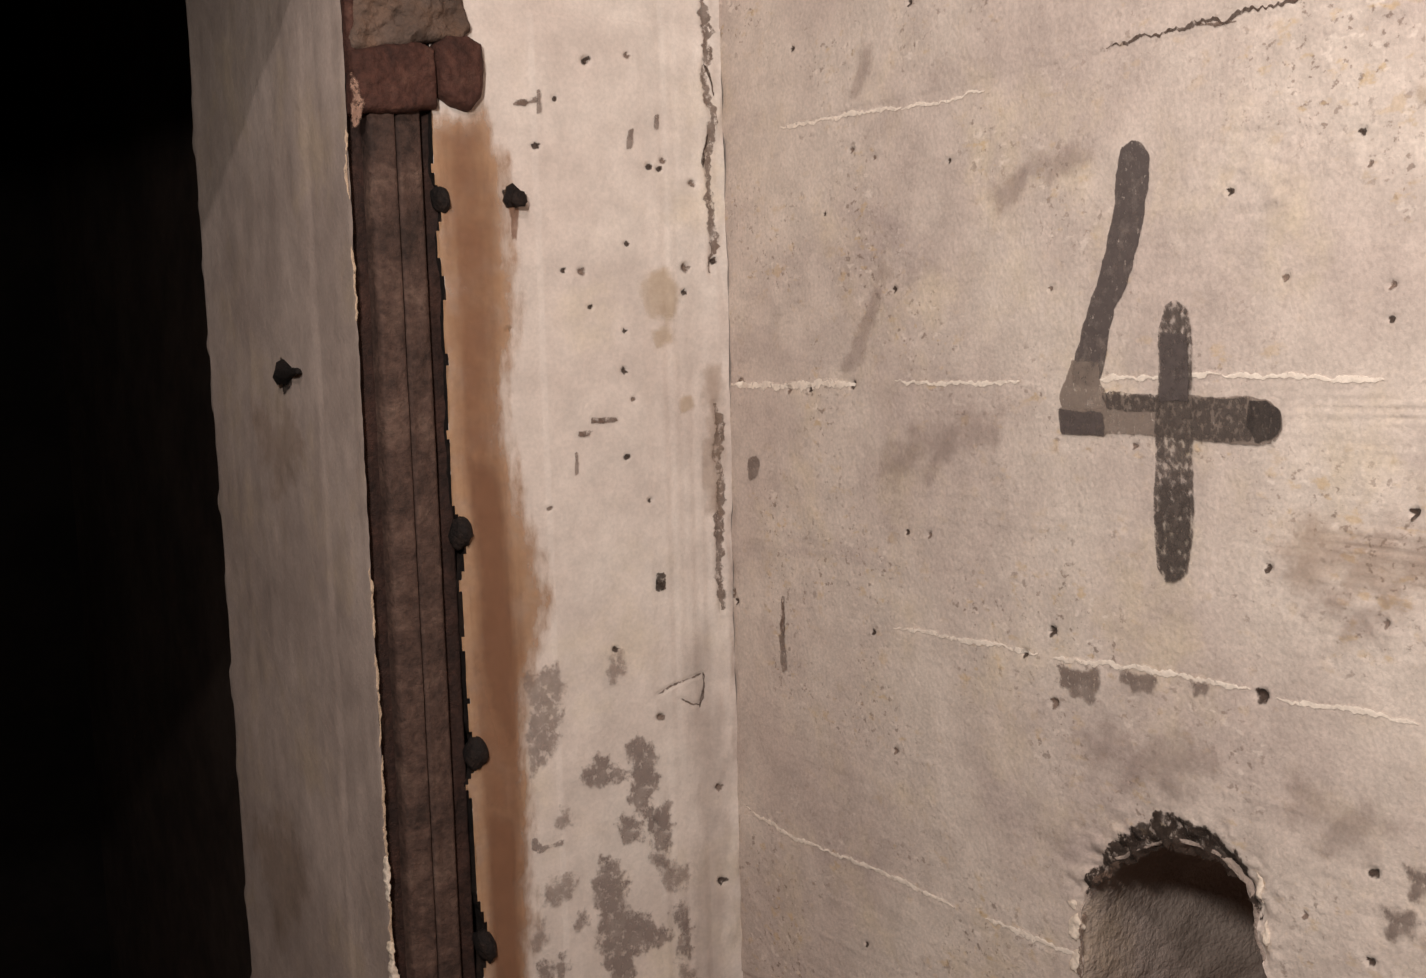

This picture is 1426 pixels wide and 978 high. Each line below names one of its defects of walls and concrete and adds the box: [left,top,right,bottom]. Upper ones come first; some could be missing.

crack [1106,0,1298,49]
corrosion [431,111,551,978]
hole [1068,810,1270,978]